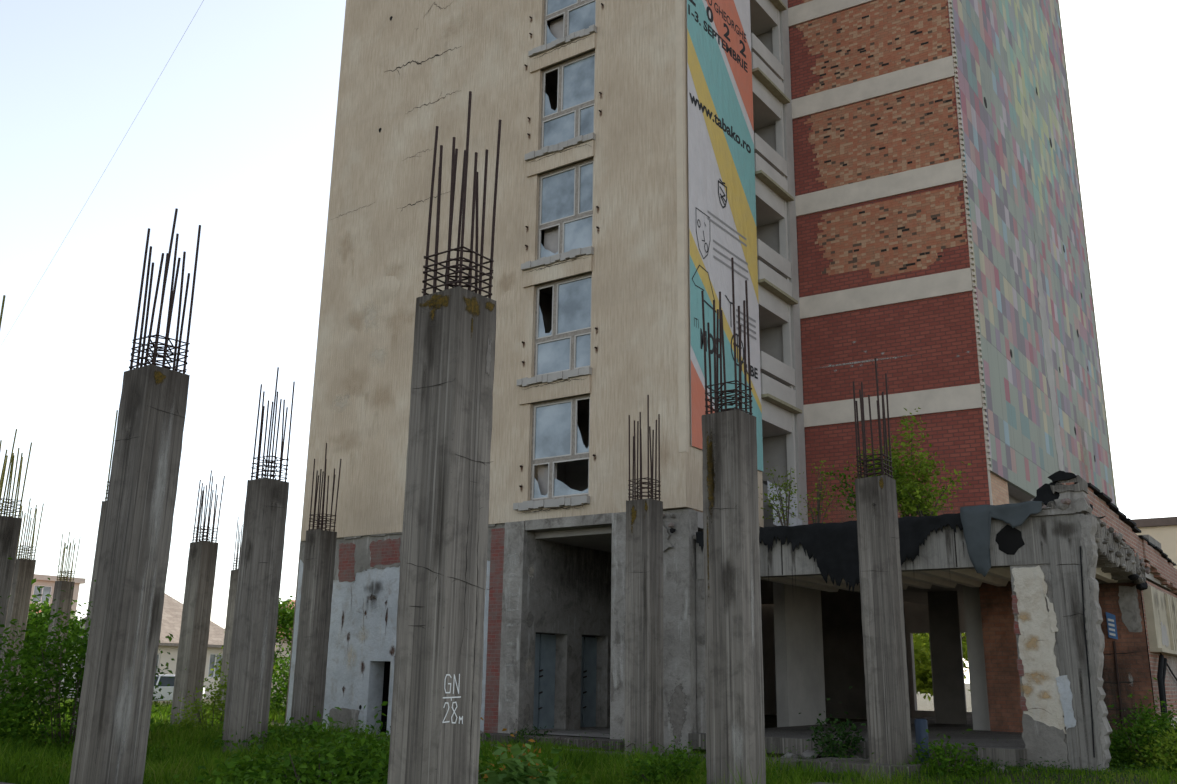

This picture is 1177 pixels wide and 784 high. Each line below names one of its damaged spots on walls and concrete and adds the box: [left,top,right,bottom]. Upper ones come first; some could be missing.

crack [385,46,461,75]
spalling [794,0,951,95]
spalling [804,78,960,190]
spalling [1086,513,1146,633]
flaking render [1011,565,1076,769]